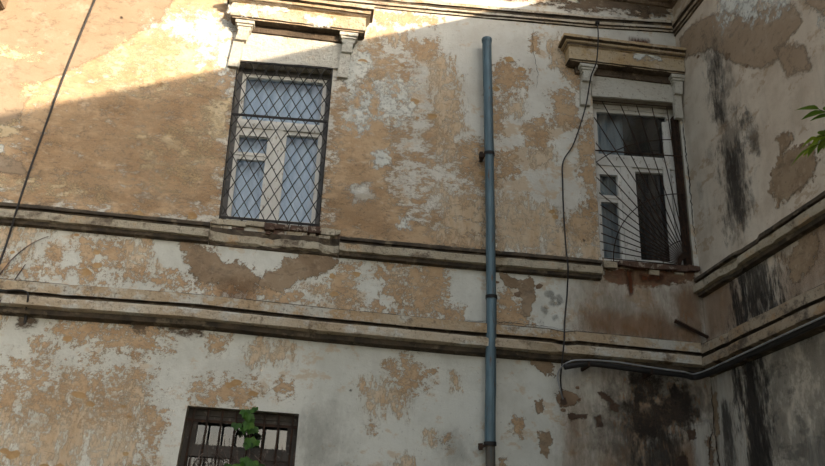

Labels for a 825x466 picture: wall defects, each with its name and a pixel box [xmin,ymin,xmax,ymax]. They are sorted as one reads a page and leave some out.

peeling [304,14,336,27]
peeling [713,0,791,28]
peeling [774,43,812,77]
peeling [0,0,288,222]
peeling [316,9,695,288]
water stain [718,137,751,225]
spalling [767,131,821,208]
peeling [0,226,466,321]
peeling [0,320,176,466]
peeling [357,350,439,436]
peeling [536,431,553,459]
water stain [602,361,770,466]